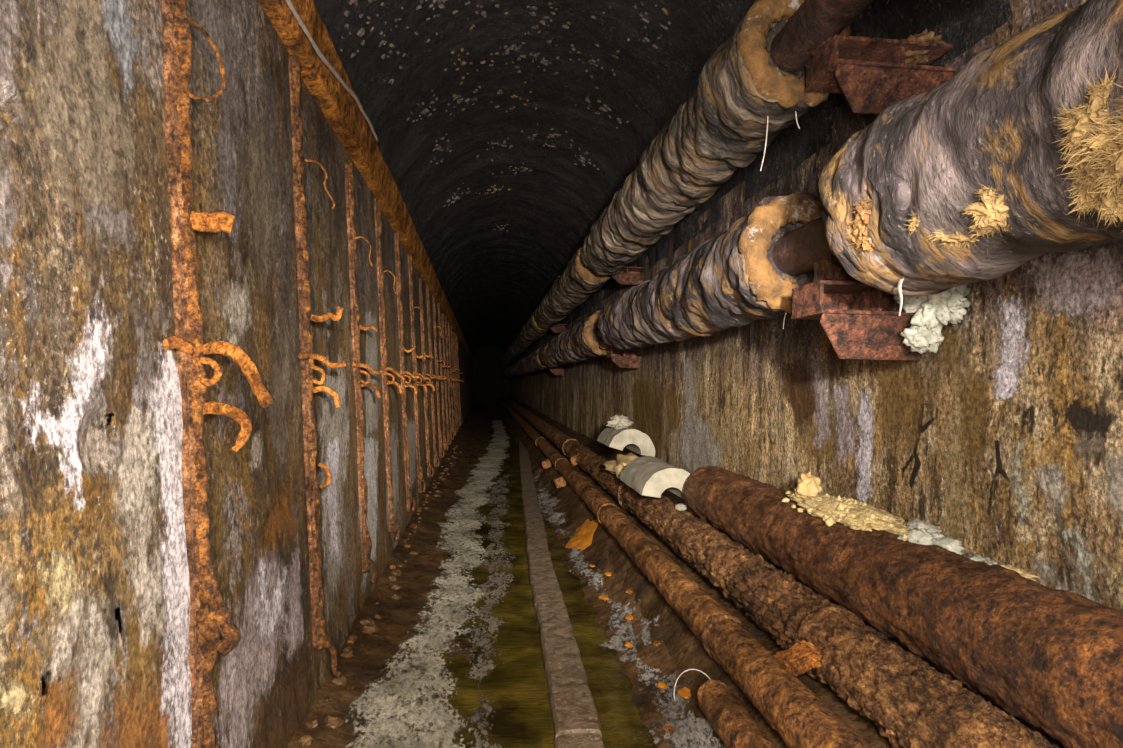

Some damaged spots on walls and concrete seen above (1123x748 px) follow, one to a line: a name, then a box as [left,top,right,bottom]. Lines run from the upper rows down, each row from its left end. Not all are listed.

damp [111,294,192,748]
damp [218,311,315,748]
damp [318,309,416,620]
damp [344,420,510,748]
rust [565,519,599,550]
rust [597,544,689,686]
rust [784,364,834,462]
damp [811,362,875,502]
rust [873,360,932,449]
crack [902,403,935,488]
damp [937,296,1030,540]
crack [988,440,1010,515]